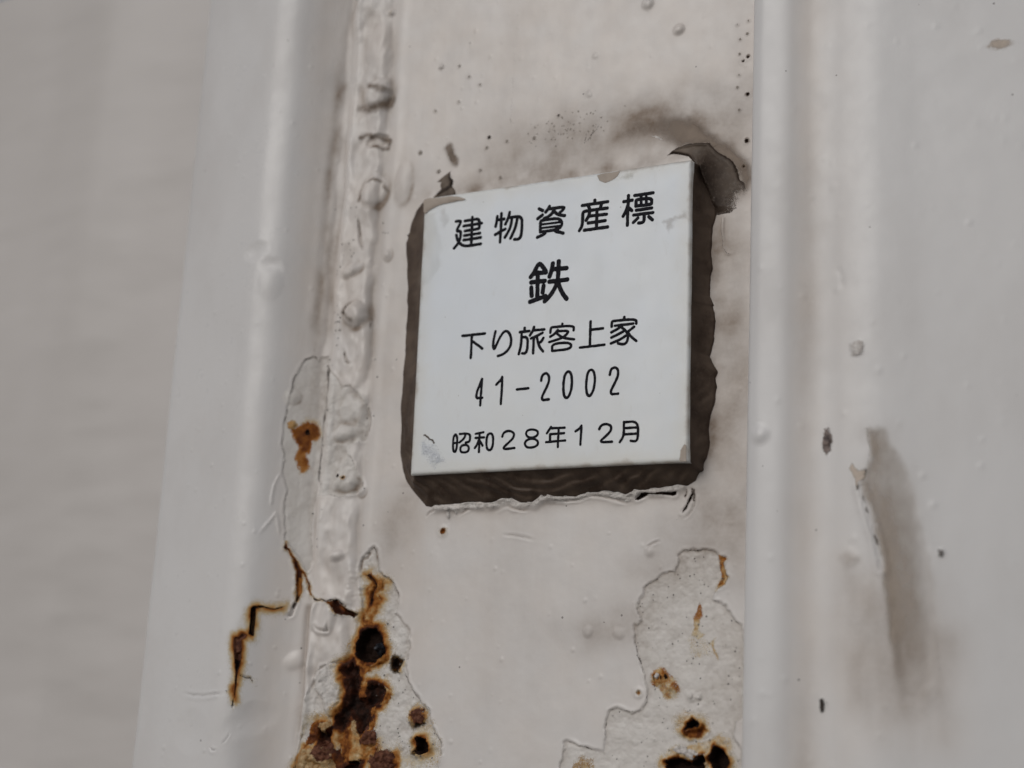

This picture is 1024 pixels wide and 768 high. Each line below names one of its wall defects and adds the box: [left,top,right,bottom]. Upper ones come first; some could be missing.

rust [287,417,324,476]
water stain [849,431,916,648]
peeling [299,659,344,751]
rust [285,564,443,768]
peeling [326,551,441,768]
peeling [559,548,744,768]
rust [650,667,681,702]
rust [670,710,738,768]